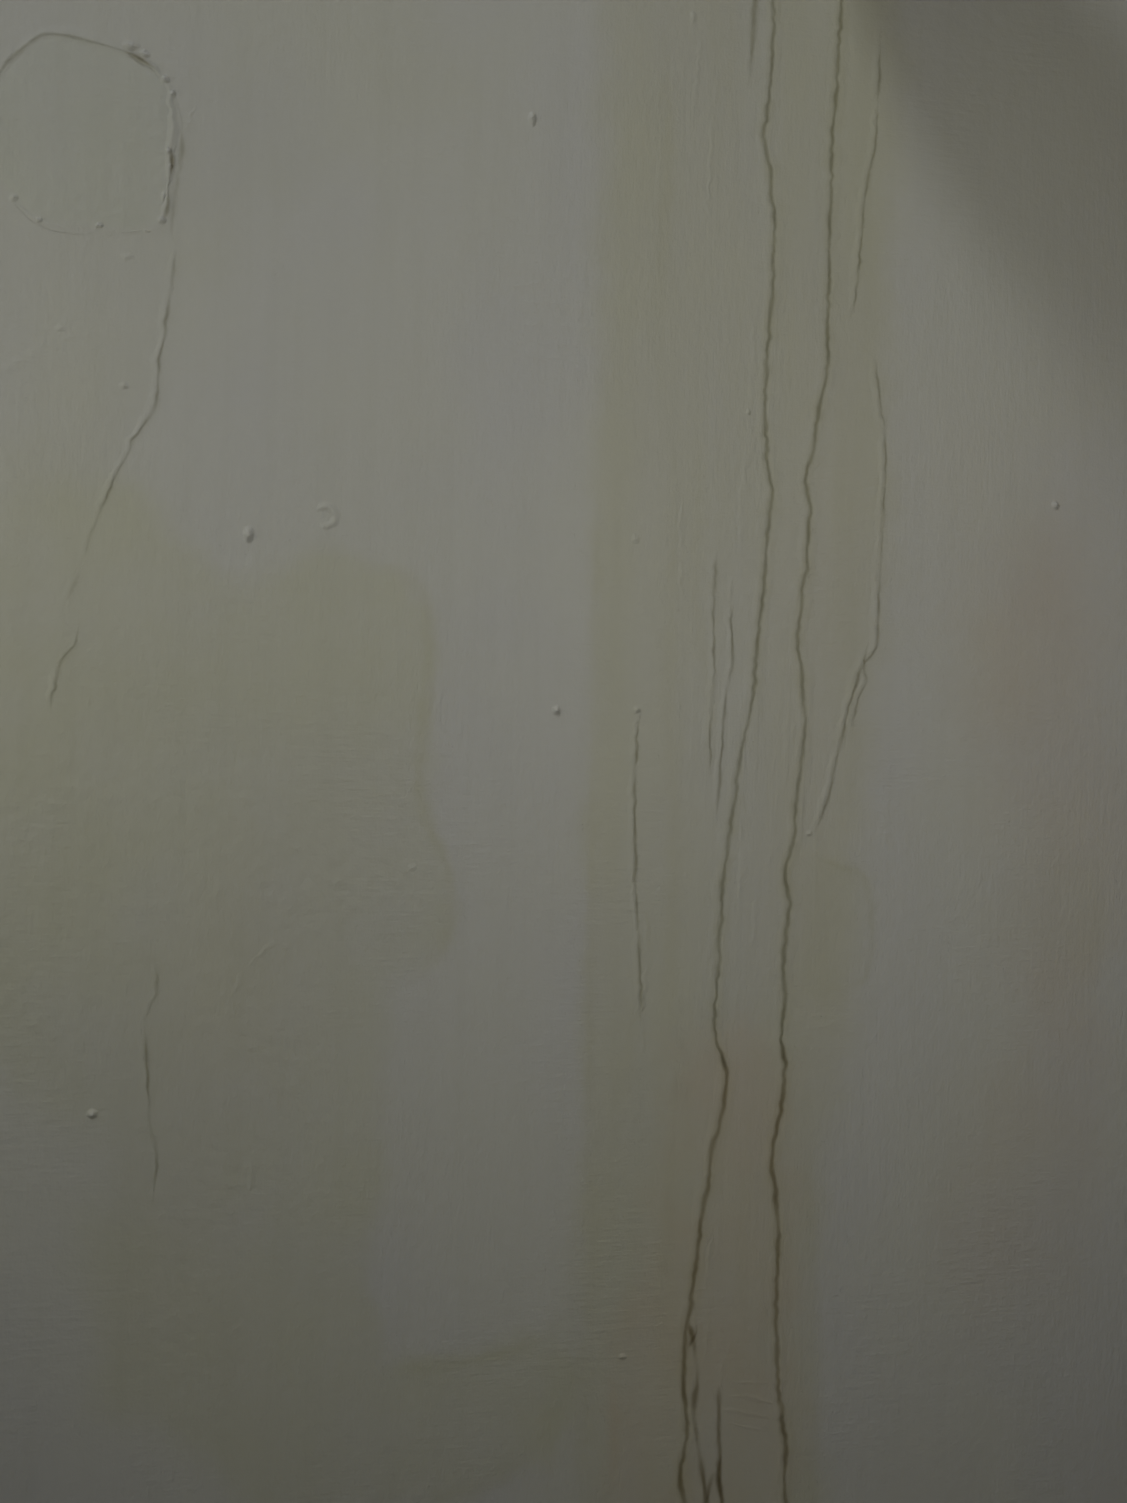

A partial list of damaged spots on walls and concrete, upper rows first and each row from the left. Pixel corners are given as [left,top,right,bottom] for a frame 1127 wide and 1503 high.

crack [44,248,178,709]
crack [668,0,888,1503]